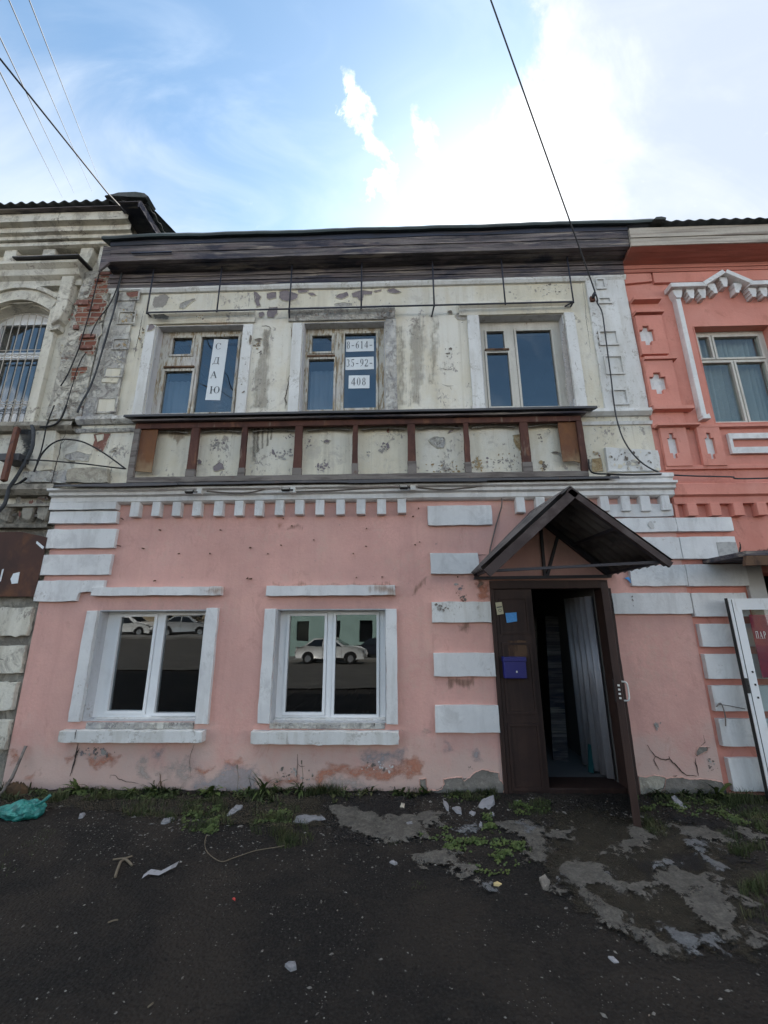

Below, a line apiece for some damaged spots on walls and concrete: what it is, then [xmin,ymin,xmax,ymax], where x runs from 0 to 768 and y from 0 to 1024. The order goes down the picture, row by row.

flaking render [153,294,204,320]
peeling [253,289,316,318]
peeling [302,288,402,319]
flaking render [68,272,112,382]
peeling [197,439,225,472]
peeling [425,425,521,473]
crack [648,735,708,777]
flaking render [276,759,504,793]